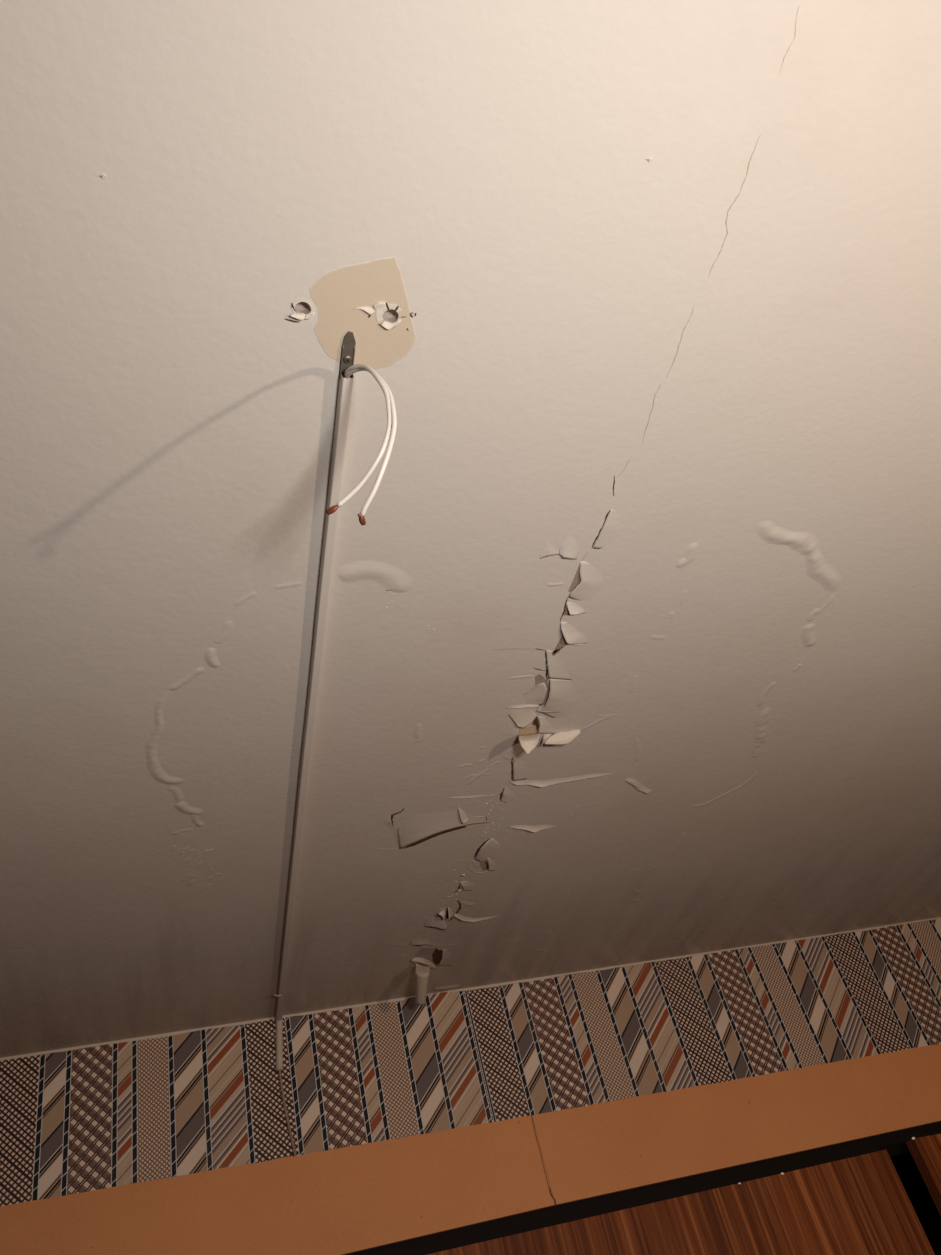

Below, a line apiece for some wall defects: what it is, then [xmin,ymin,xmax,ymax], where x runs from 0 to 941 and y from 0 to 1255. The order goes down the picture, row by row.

crack [709,141,758,275]
crack [582,308,694,561]
peeling [500,536,617,761]
peeling [509,773,652,794]
peeling [377,807,557,1005]